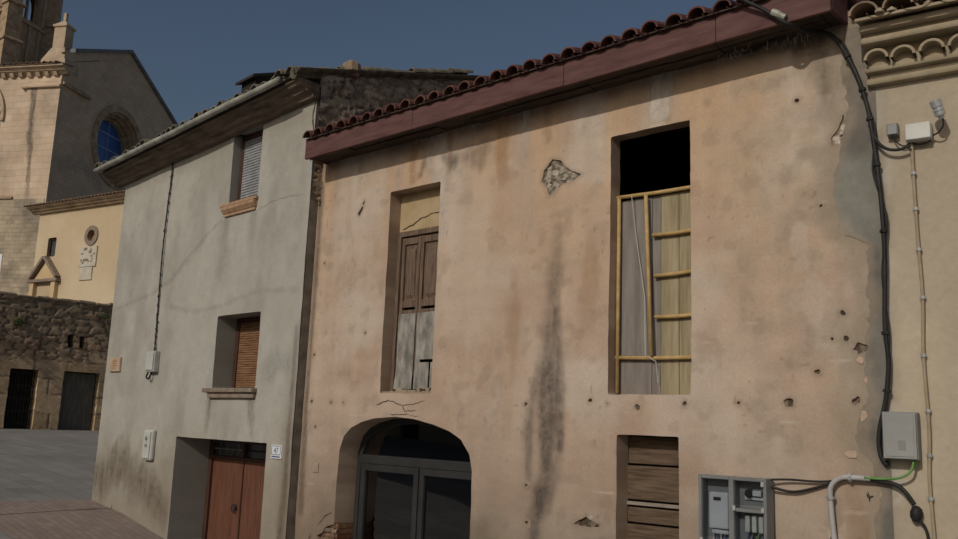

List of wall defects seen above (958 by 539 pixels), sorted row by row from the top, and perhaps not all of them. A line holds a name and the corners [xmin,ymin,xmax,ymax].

spalling [832,116,845,147]
spalling [543,160,581,195]
crack [378,400,423,417]
leakage [540,399,555,478]
spalling [319,520,353,539]
spalling [575,516,600,527]